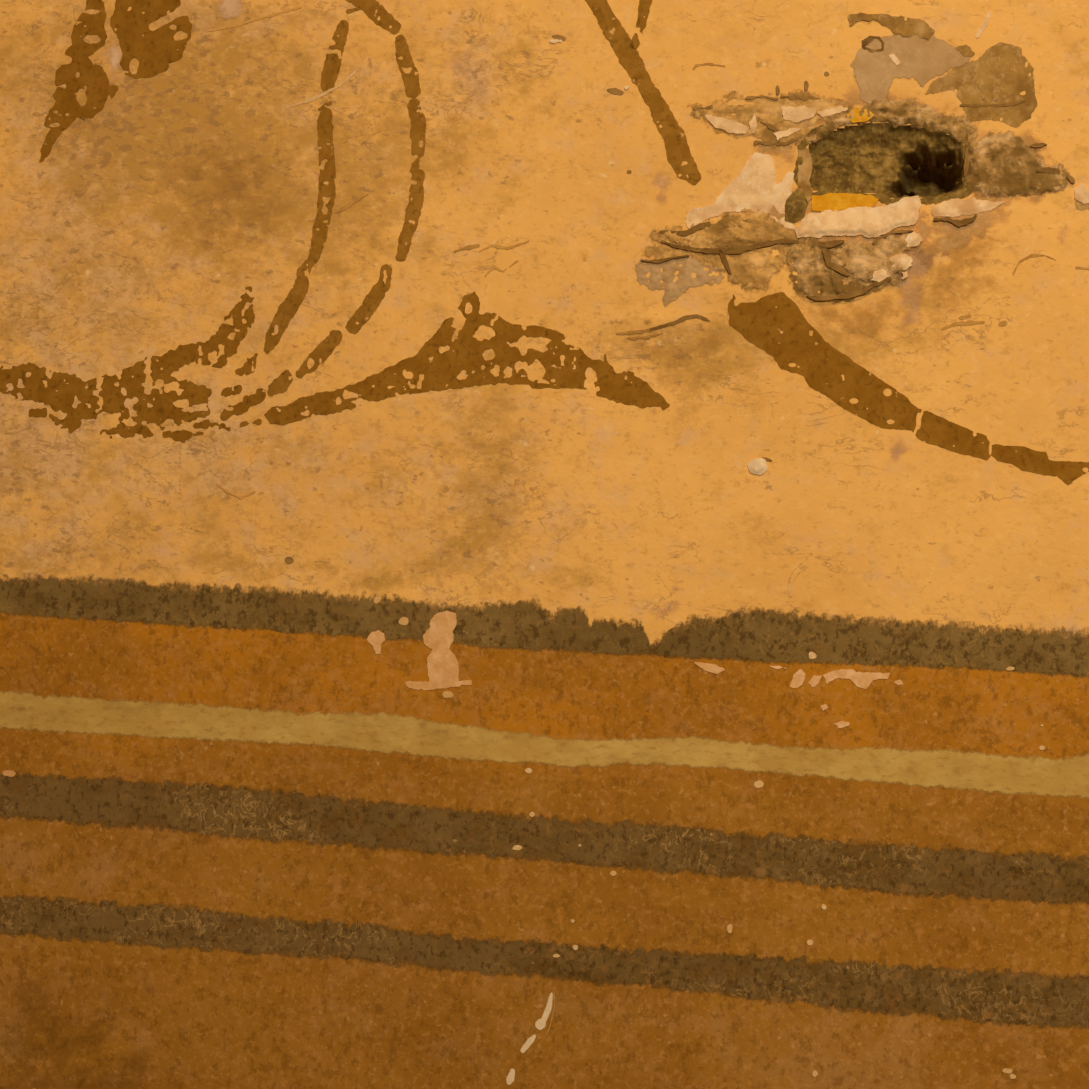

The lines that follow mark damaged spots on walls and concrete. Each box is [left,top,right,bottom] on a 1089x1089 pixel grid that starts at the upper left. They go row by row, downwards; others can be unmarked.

spalling [635,12,1089,306]
peeling [405,611,472,698]
peeling [770,665,903,689]